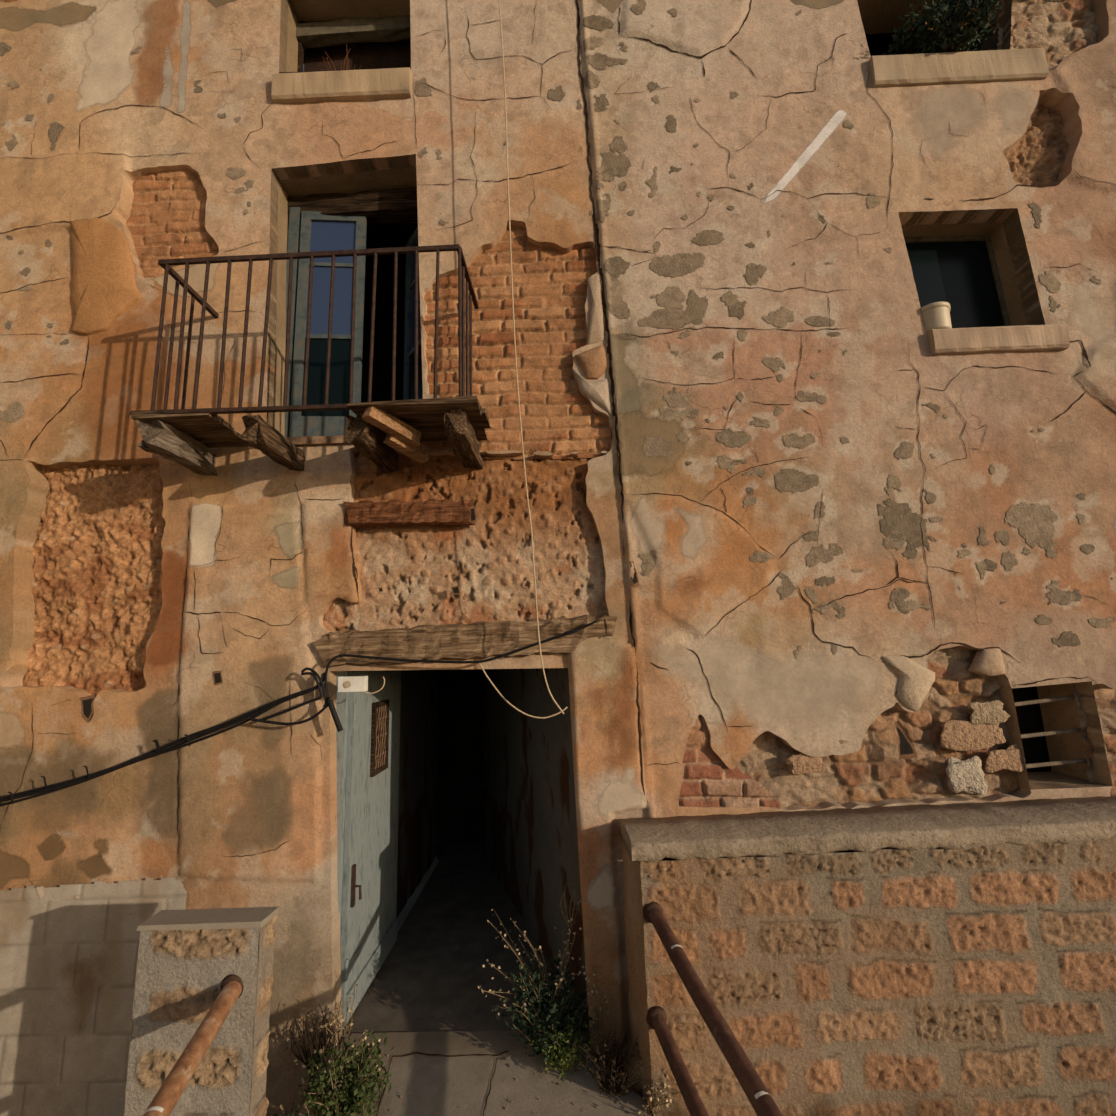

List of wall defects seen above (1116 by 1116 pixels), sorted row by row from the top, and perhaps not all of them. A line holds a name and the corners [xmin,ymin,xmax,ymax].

spalling [1004,105,1069,187]
spalling [126,170,220,297]
crack [0,336,89,460]
spalling [323,225,819,632]
crack [322,0,1116,733]
spalling [23,463,166,723]
water stain [138,692,178,830]
crack [174,484,307,873]
water stain [225,774,288,849]
water stain [251,659,291,747]
crack [629,598,678,807]
spalling [668,642,1020,809]